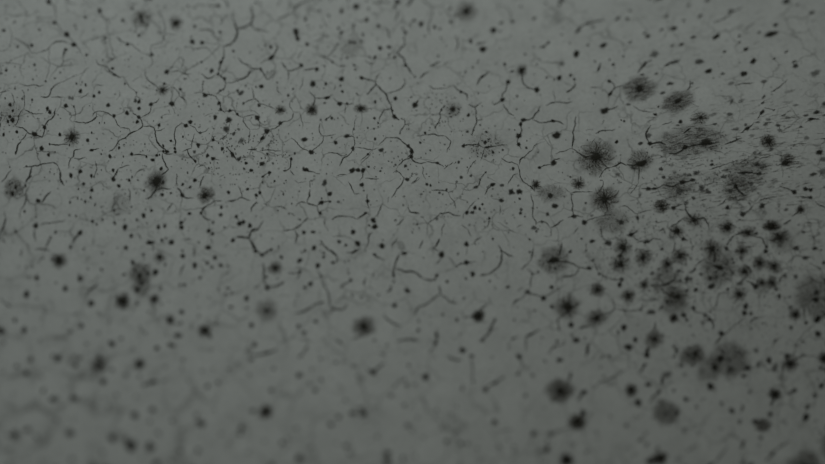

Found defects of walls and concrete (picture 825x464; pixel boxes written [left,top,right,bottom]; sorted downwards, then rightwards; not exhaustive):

crack [0,0,824,362]
leakage [533,285,586,342]
leakage [568,410,586,429]
leakage [639,439,666,464]